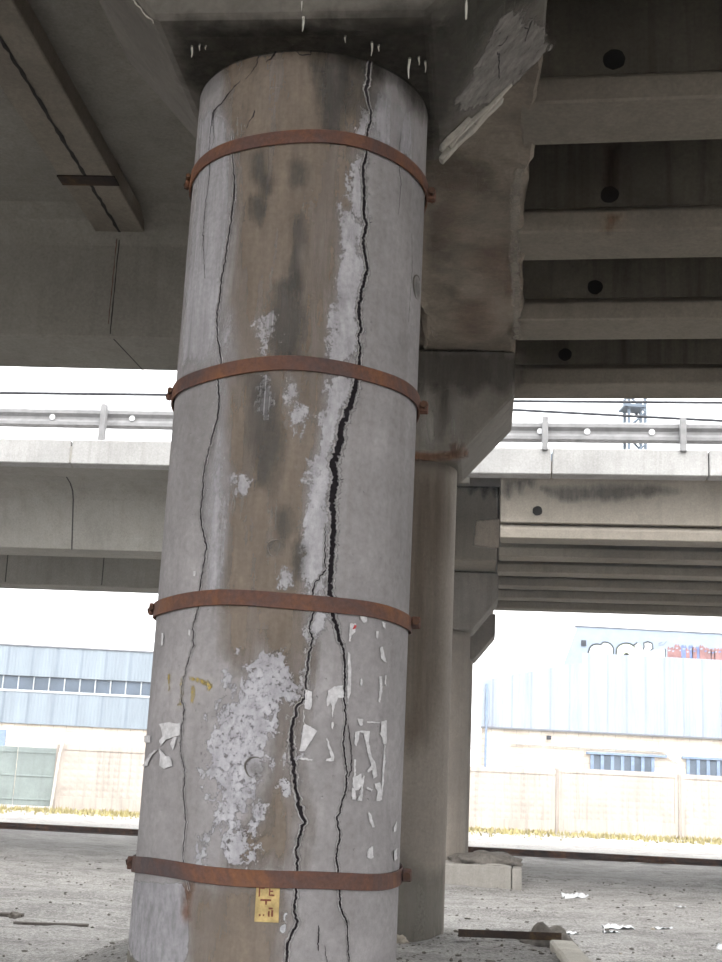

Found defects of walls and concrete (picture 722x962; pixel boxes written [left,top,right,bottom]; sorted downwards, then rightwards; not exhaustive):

spalling [439,9,553,164]
leakage [182,0,520,364]
crack [179,51,312,891]
leakage [208,370,354,595]
crack [284,62,373,962]
leakage [417,349,522,454]
leakage [545,486,662,500]
peeling [298,616,367,761]
peeling [352,718,387,801]